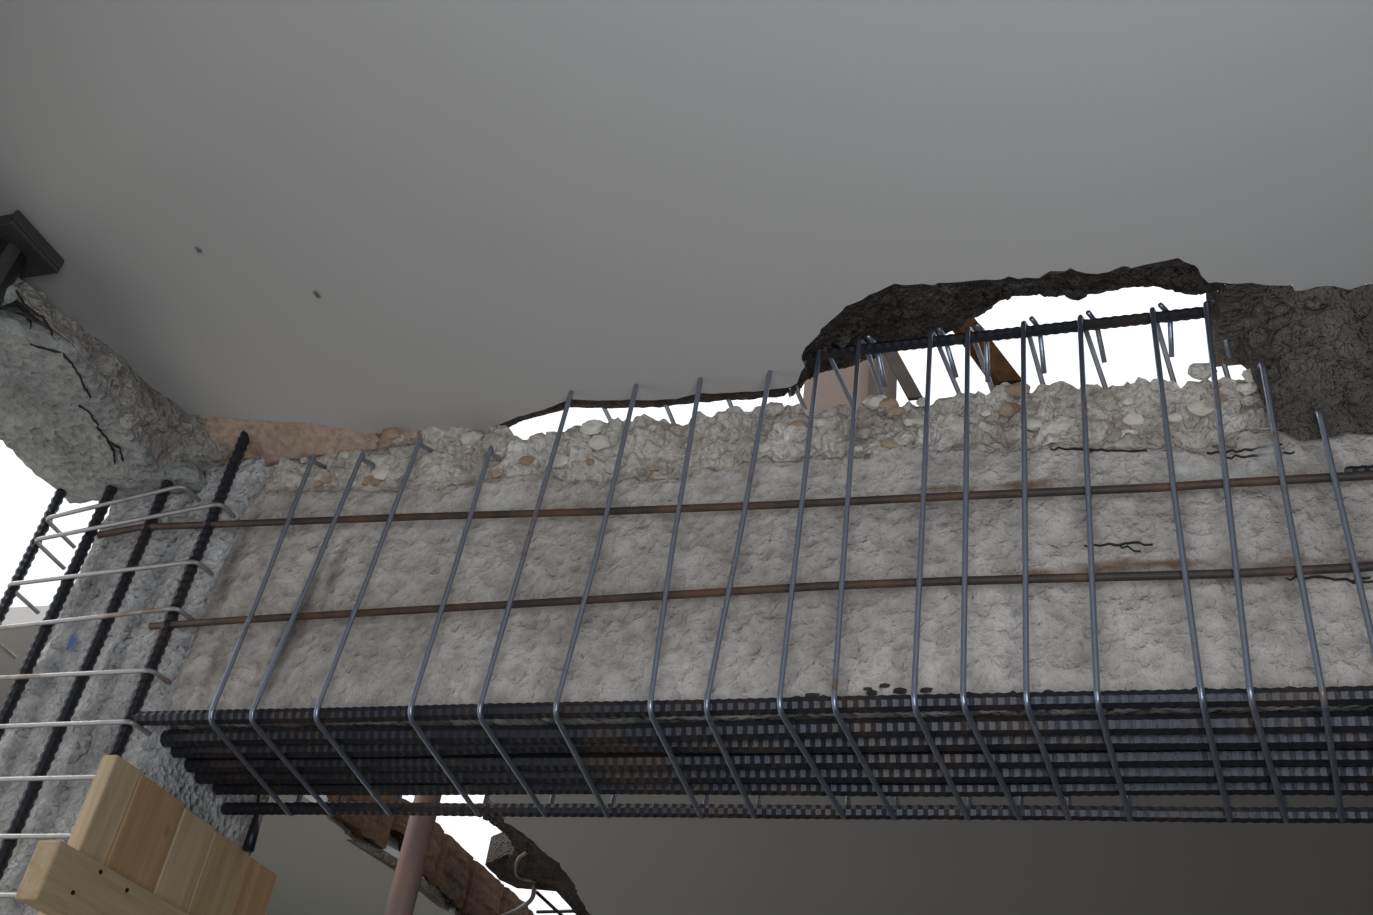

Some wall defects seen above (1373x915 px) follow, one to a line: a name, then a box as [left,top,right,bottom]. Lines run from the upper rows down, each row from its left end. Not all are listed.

crack [15,290,124,465]
spalling [13,258,1373,496]
corrosion [1095,560,1189,571]
spalling [863,683,933,695]
spalling [482,799,591,915]